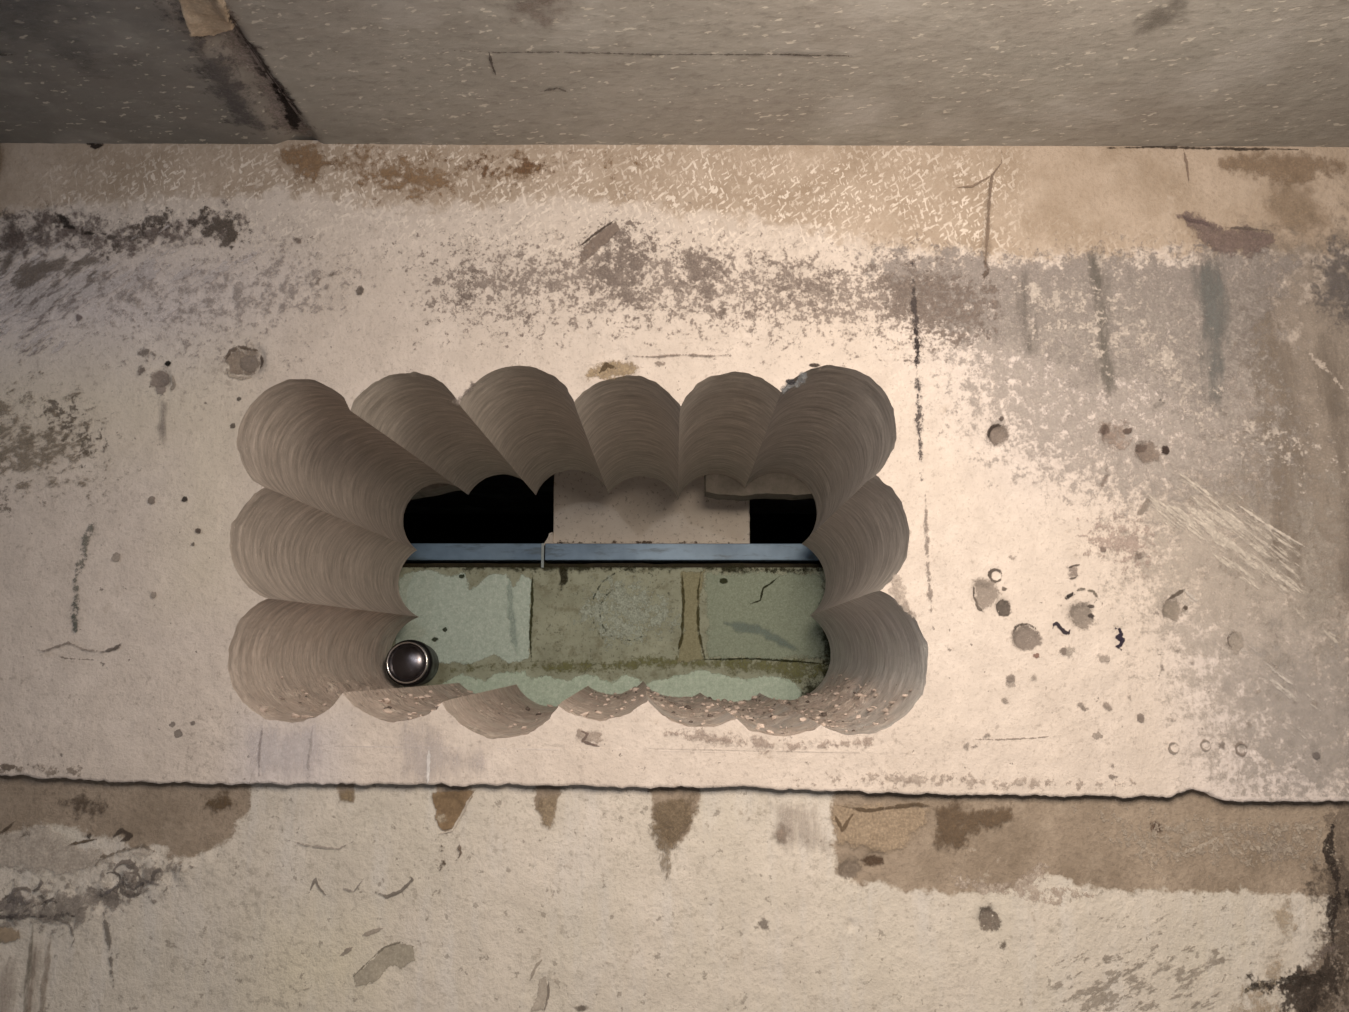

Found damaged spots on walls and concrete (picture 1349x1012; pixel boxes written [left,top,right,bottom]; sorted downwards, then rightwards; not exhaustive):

rust [280,143,555,202]
water stain [0,200,376,518]
water stain [856,151,1349,1012]
spalling [432,790,474,871]
spalling [535,796,557,827]
spalling [831,772,1050,879]
crack [0,844,159,987]
peeling [353,928,415,986]